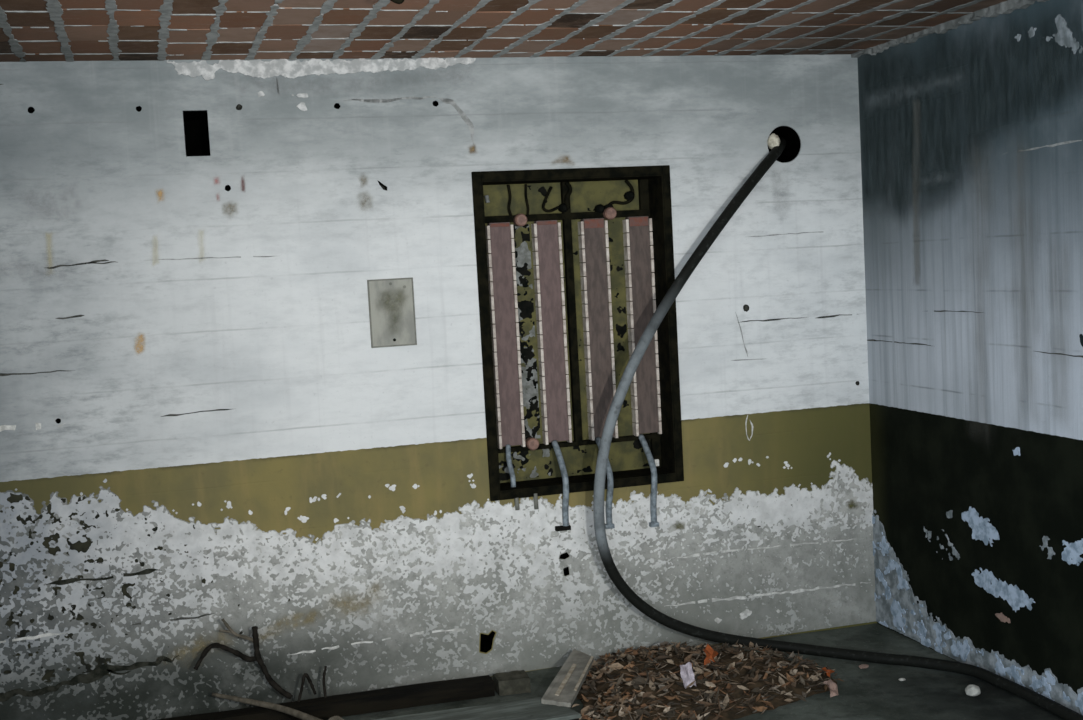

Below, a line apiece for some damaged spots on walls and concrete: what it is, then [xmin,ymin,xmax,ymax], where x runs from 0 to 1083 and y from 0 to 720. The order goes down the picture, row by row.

water stain [862,26,1083,213]
peeling [633,439,651,467]
peeling [0,453,1083,720]